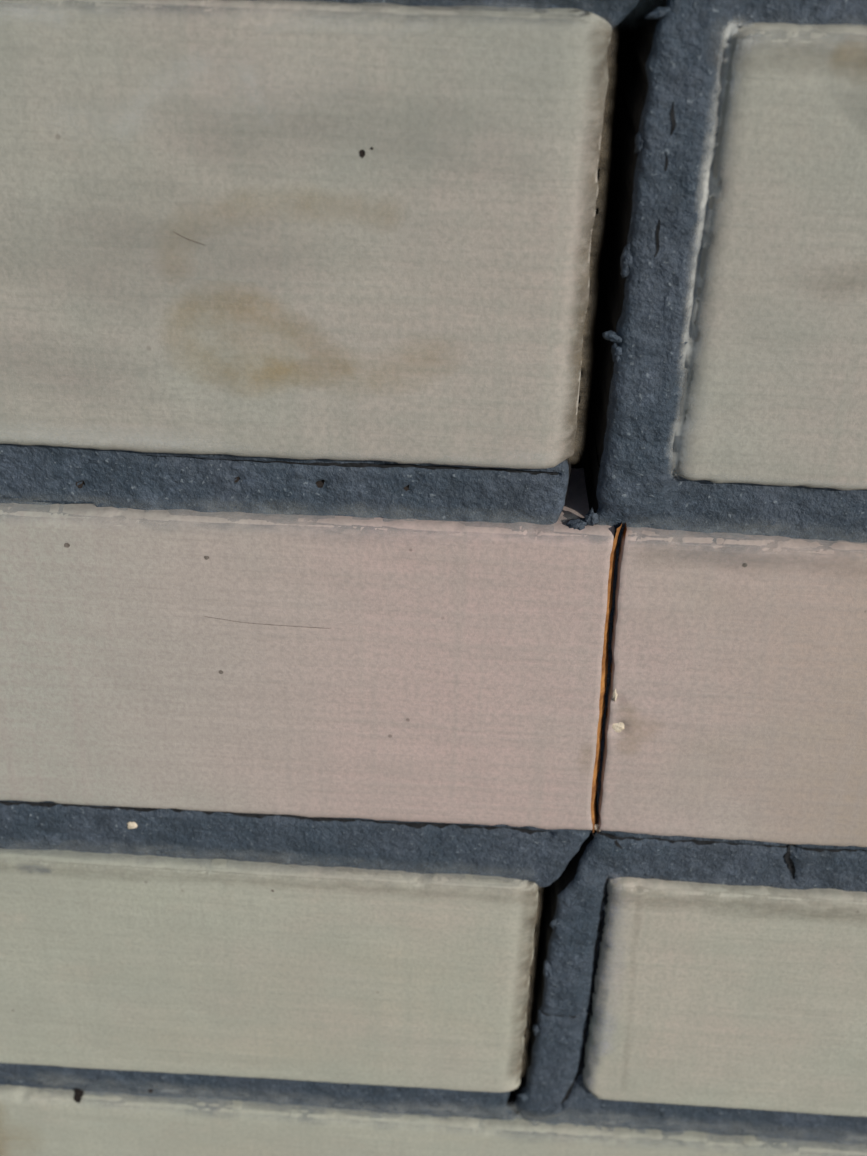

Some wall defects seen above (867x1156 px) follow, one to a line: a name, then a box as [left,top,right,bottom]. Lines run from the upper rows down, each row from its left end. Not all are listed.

crack [149,0,866,1116]